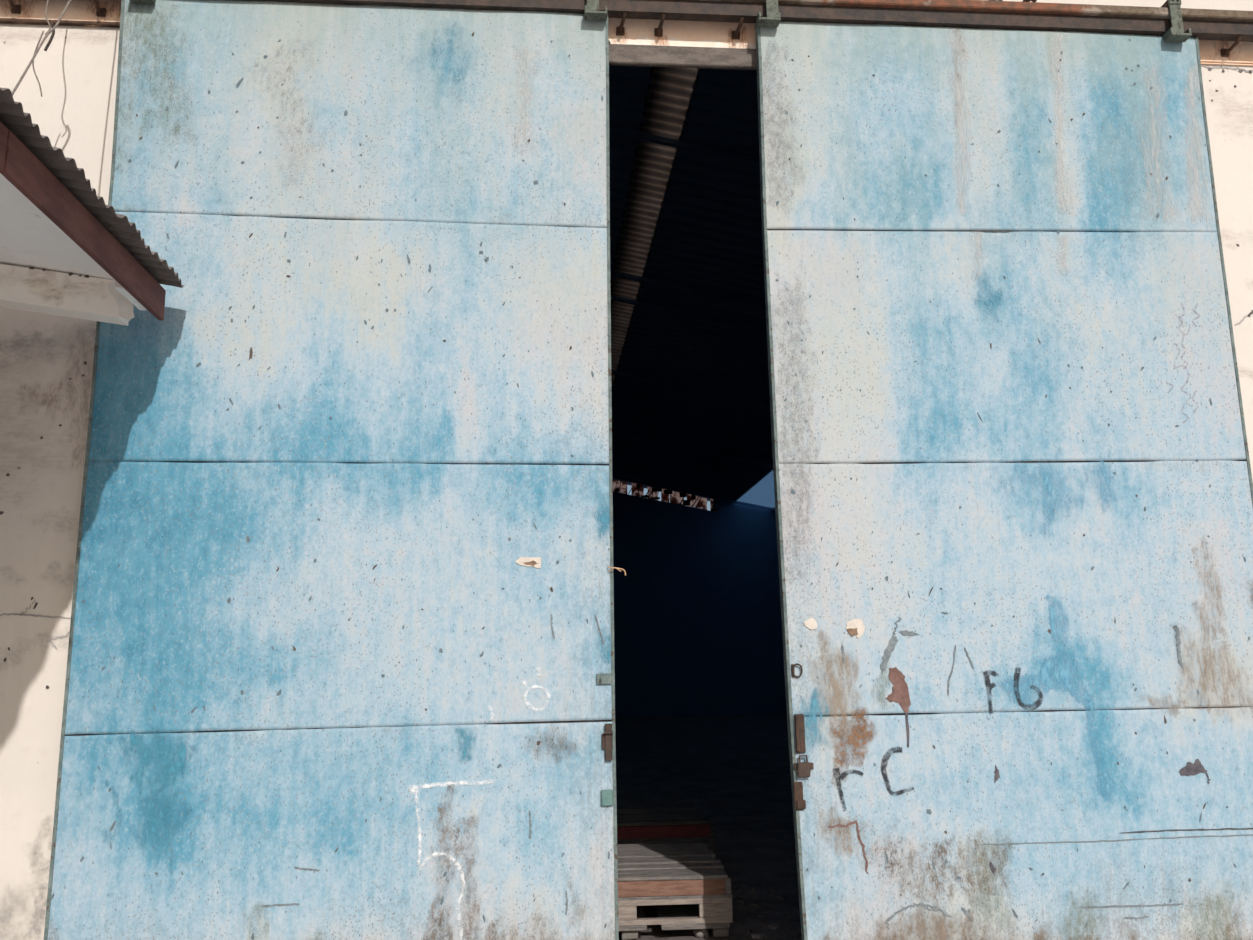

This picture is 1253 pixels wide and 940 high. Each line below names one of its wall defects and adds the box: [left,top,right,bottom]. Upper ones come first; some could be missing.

crack [0,598,71,649]
rust [827,655,873,764]